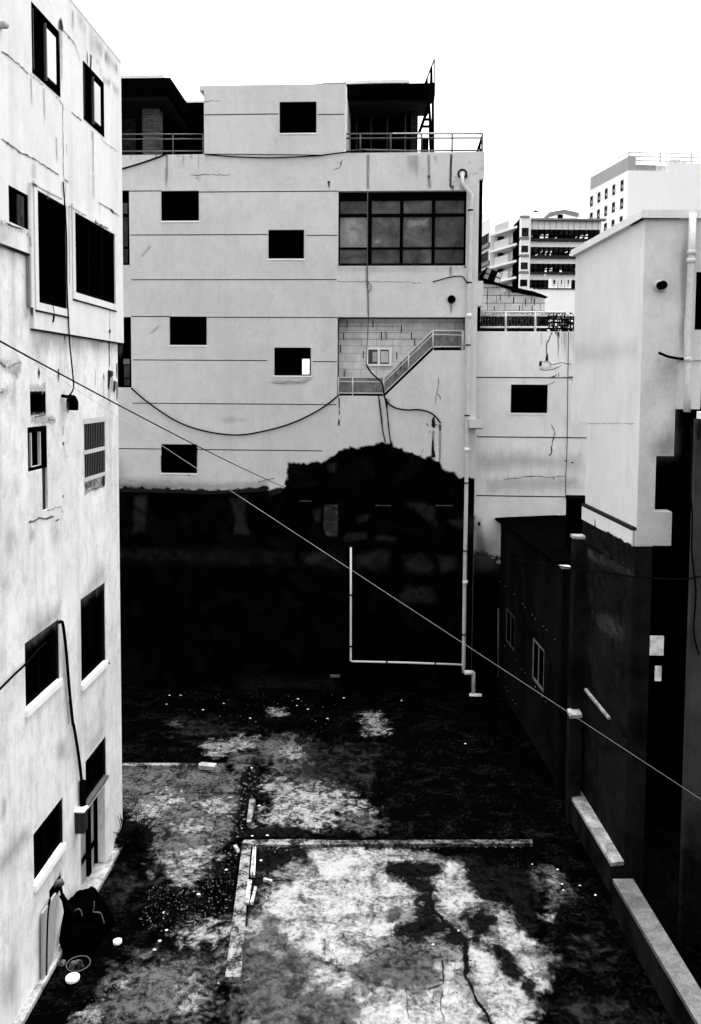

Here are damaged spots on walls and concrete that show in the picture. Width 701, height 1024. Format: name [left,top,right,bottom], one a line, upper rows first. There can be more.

crack [504,425,573,480]
crack [29,506,63,523]